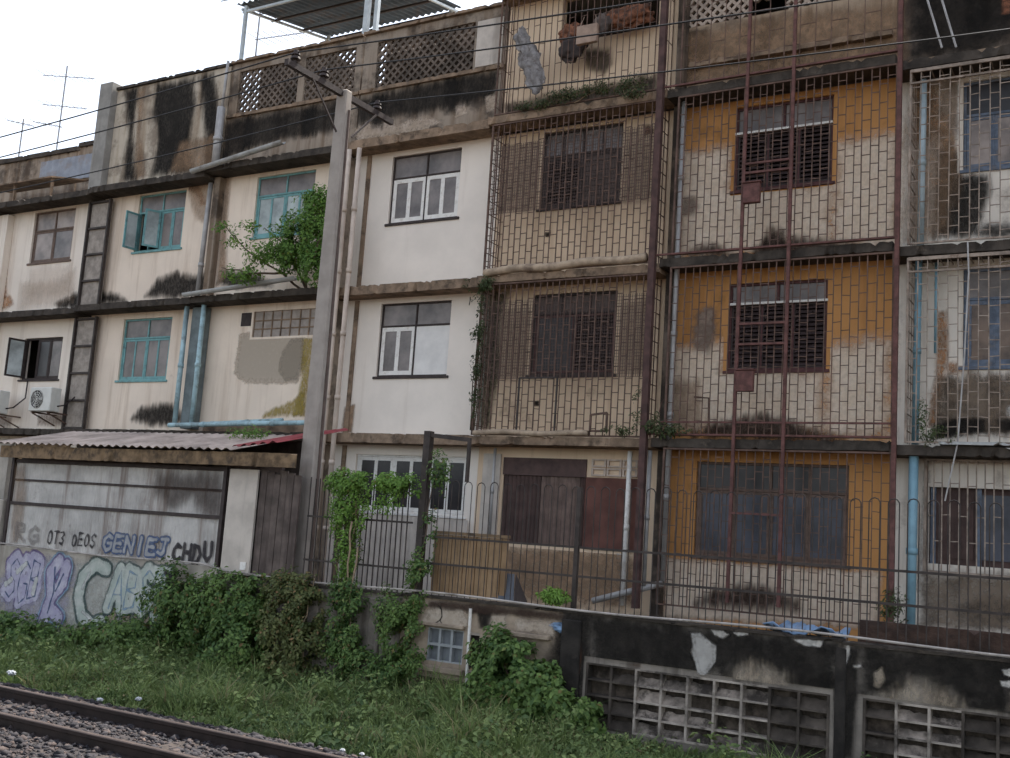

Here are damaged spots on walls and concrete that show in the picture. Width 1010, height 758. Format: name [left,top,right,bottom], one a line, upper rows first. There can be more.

damp [124,74,336,181]
damp [911,80,1010,238]
damp [148,271,204,298]
damp [132,403,182,426]
flaking render [691,631,746,675]